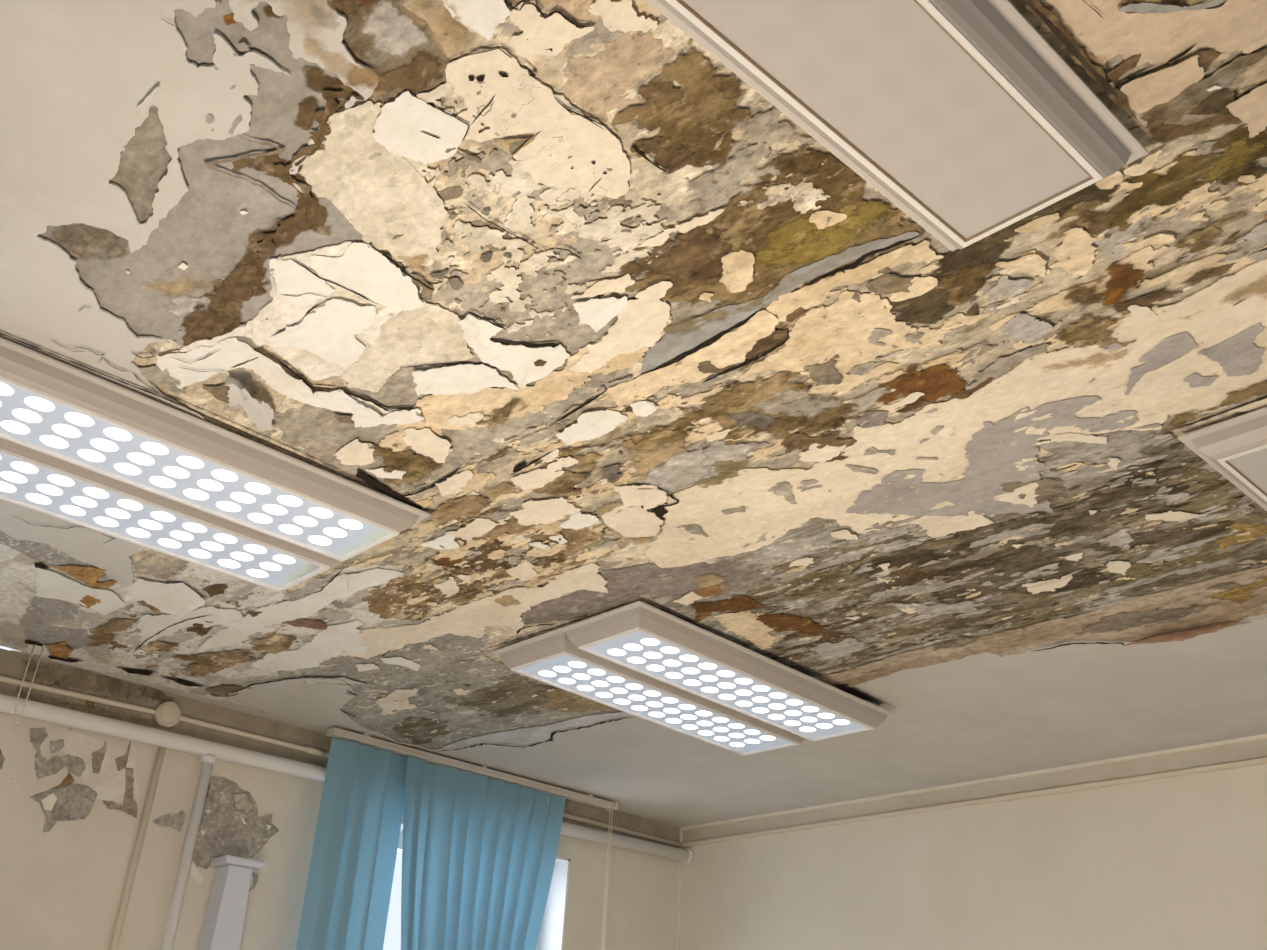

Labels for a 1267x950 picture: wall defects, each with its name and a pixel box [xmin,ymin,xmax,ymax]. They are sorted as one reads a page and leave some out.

water stain [1072,46,1105,75]
water stain [1118,0,1224,14]
water stain [611,39,924,325]
water stain [885,112,1267,324]
peeling [0,0,1267,752]
crack [510,236,944,476]
water stain [616,313,1136,488]
crack [397,468,460,498]
peeling [29,726,139,832]
peeling [153,810,185,833]
peeling [191,776,279,885]